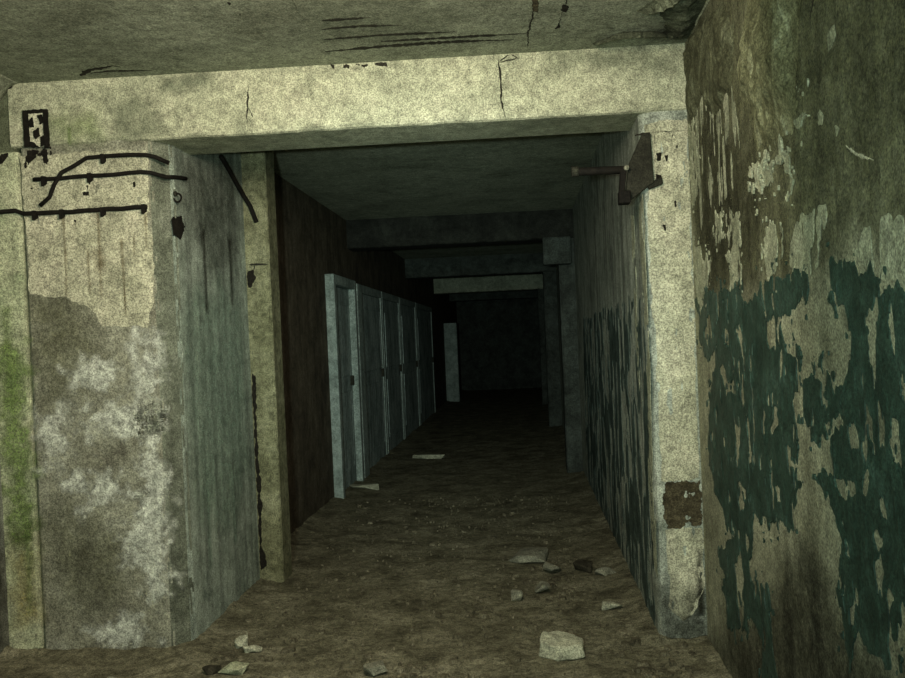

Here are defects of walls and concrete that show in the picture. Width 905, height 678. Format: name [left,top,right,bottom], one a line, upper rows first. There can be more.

peeling [637,0,679,14]
crack [292,0,534,119]
peeling [827,25,836,52]
peeling [583,86,905,678]
leakage [38,402,68,455]
leakage [60,326,179,602]
leakage [86,613,143,648]